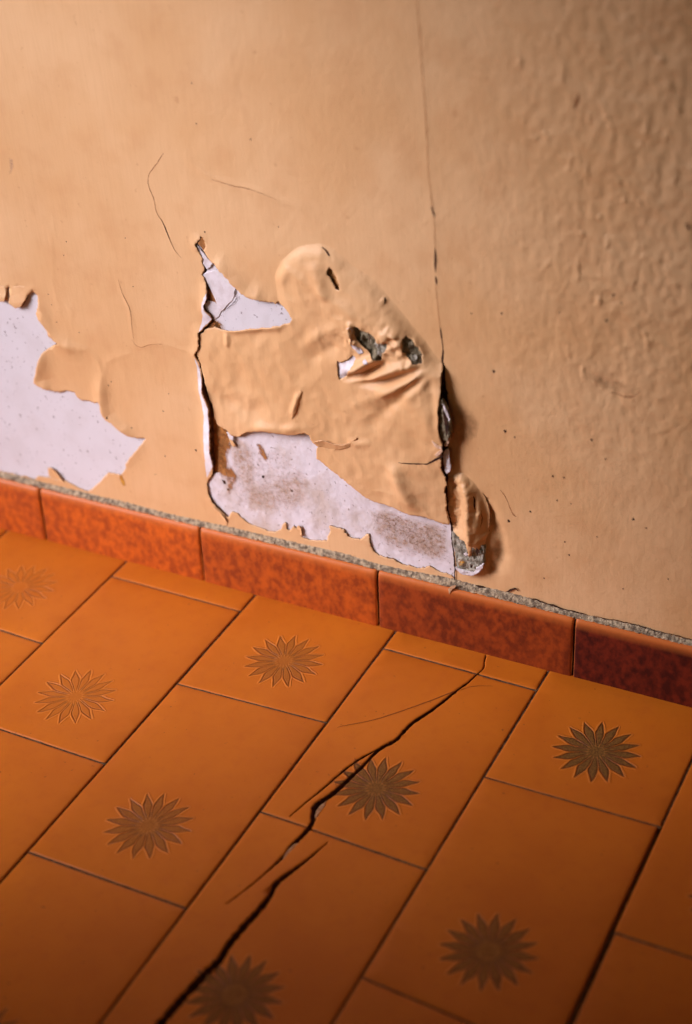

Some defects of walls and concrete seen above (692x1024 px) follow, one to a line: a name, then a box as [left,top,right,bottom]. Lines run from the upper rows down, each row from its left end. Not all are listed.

peeling [0,286,145,491]
crack [148,153,179,255]
peeling [197,231,292,331]
crack [416,0,692,640]
peeling [208,413,486,594]
crack [156,657,486,1024]